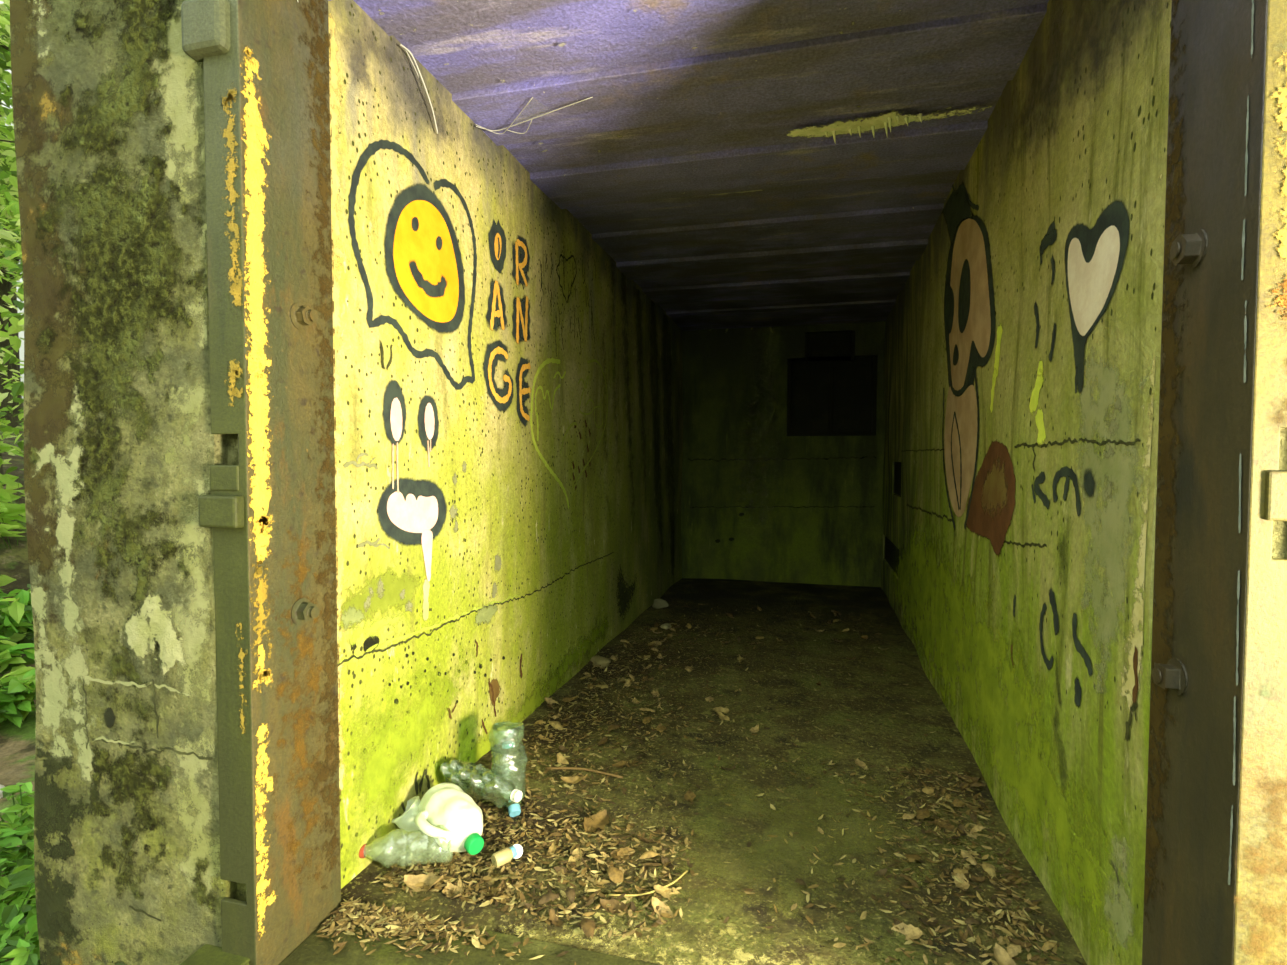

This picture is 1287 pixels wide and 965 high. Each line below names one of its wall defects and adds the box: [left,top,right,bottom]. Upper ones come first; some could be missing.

peeling [147,1,205,218]
peeling [181,223,207,354]
water stain [787,101,992,144]
water stain [1012,0,1155,155]
rust [1268,52,1287,318]
water stain [10,0,102,965]
peeling [220,47,278,940]
rust [275,0,341,888]
crack [82,676,212,760]
peeling [120,374,220,911]